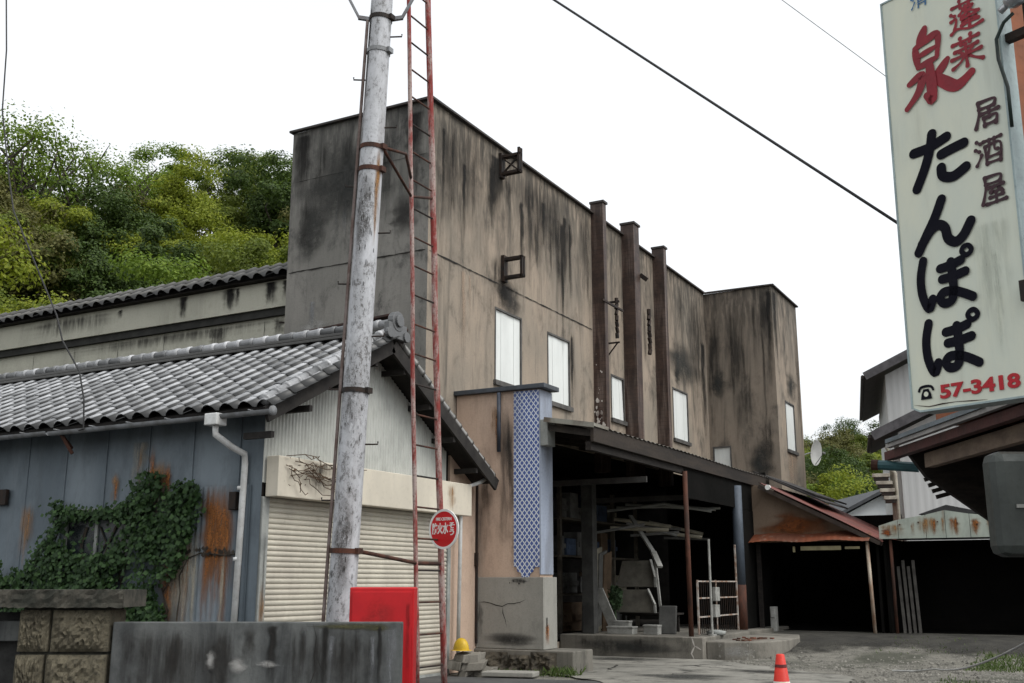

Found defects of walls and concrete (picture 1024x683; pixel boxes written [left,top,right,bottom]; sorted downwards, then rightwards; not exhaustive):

leakage [297,136,360,252]
leakage [412,112,421,148]
leakage [443,129,475,213]
leakage [490,155,510,204]
leakage [494,263,518,309]
leakage [520,193,572,300]
leakage [669,325,743,409]
leakage [752,291,778,374]
rust [203,497,230,597]
rust [911,518,958,531]
leakage [158,638,245,680]
leakage [259,627,276,667]